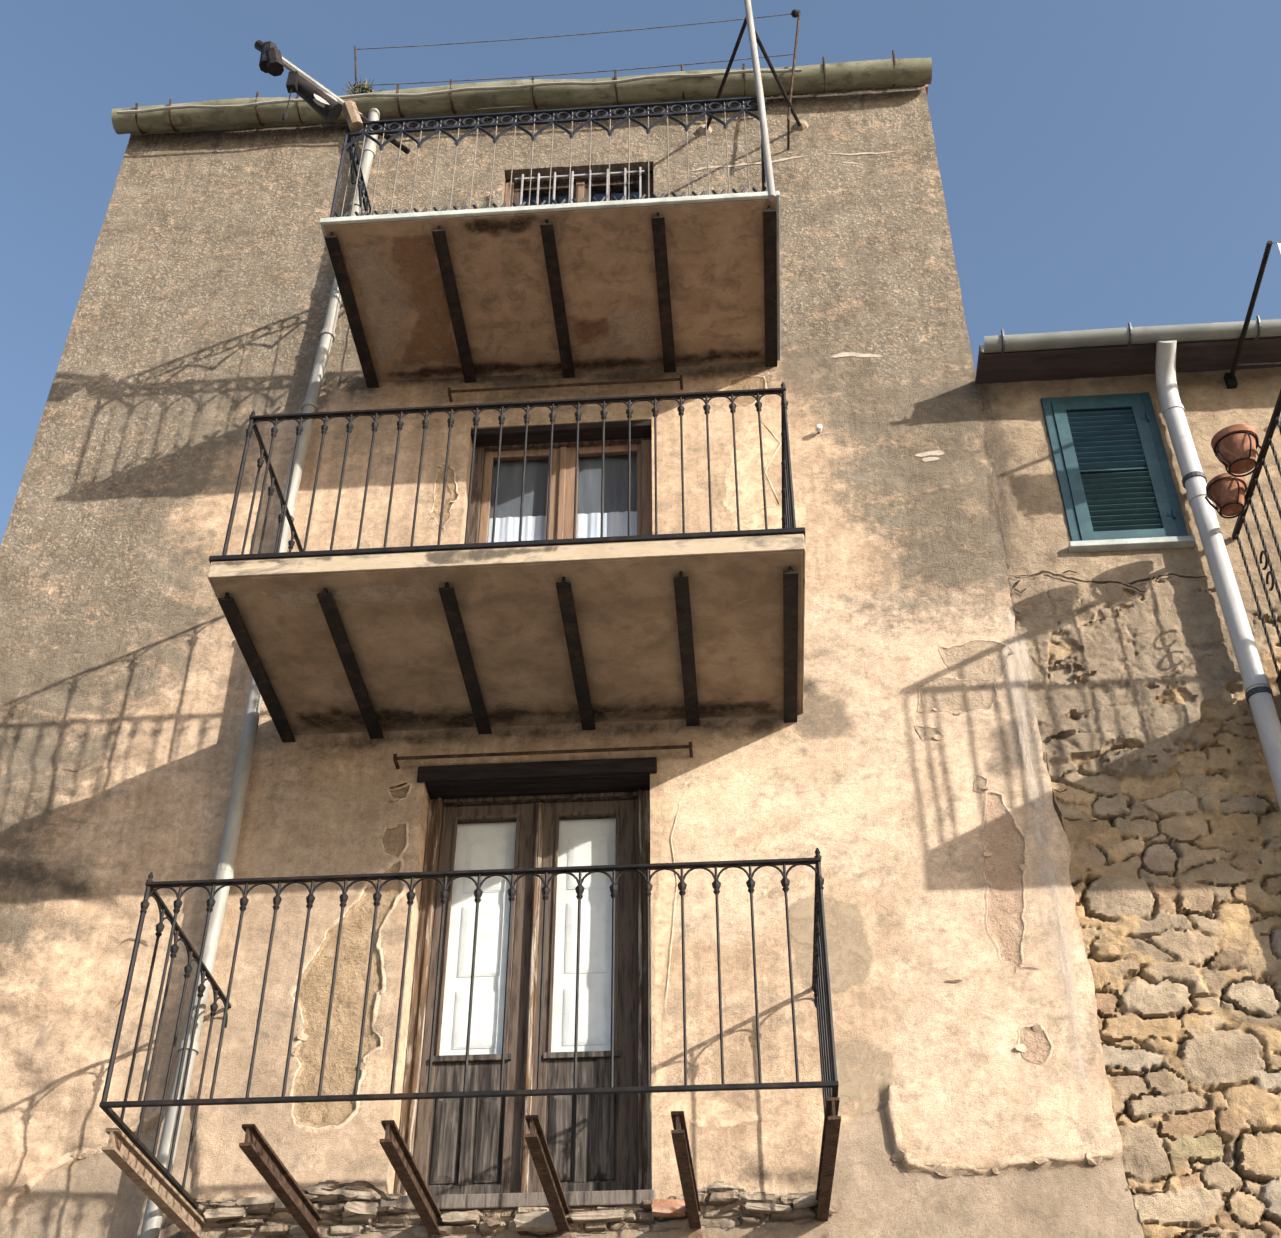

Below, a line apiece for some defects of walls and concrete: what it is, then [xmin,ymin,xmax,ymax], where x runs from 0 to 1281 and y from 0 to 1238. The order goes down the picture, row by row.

water stain [465,218,530,234]
water stain [350,236,760,383]
flaking render [428,463,460,529]
crack [1008,569,1210,625]
water stain [300,702,775,748]
flaking render [914,639,1013,742]
water stain [0,863,85,895]
flaking render [972,774,1028,968]
flaking render [287,821,409,1132]
flaking render [0,1107,165,1211]